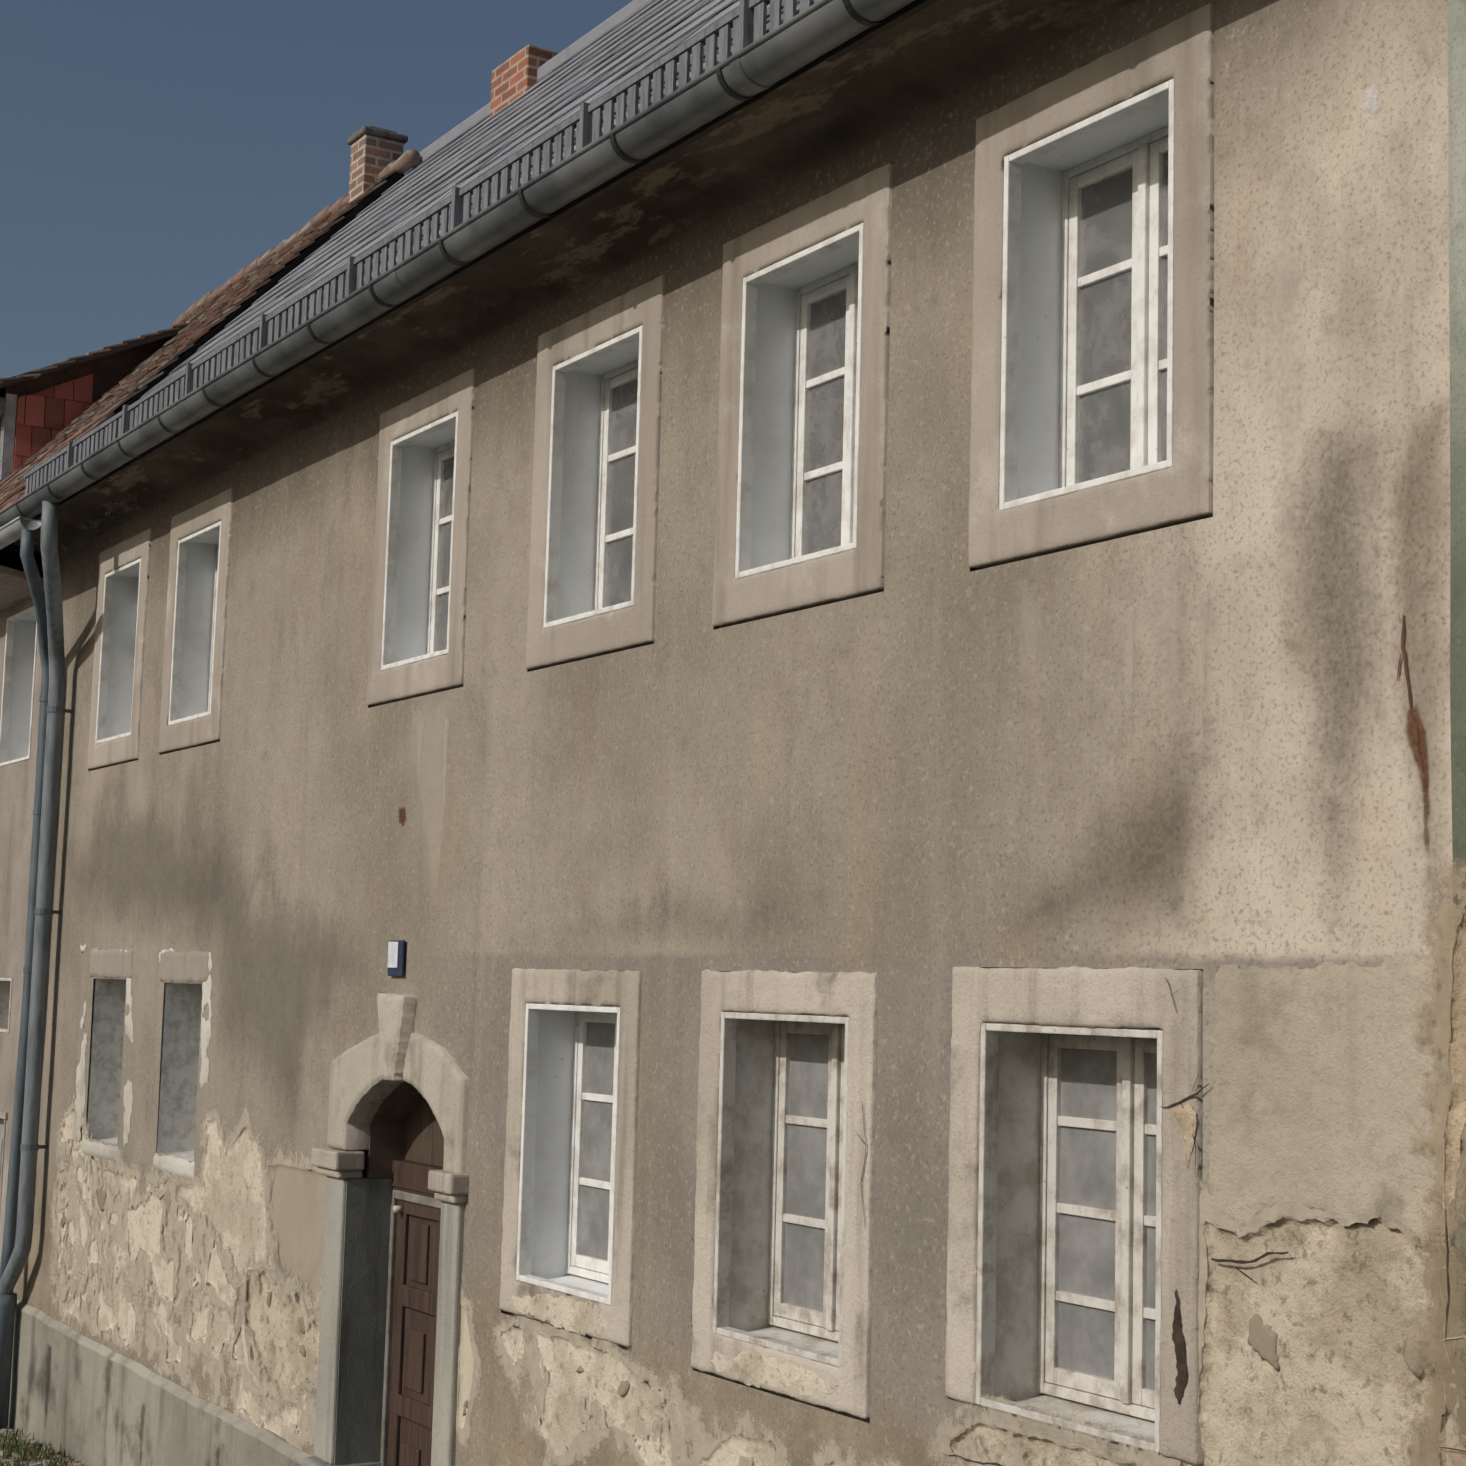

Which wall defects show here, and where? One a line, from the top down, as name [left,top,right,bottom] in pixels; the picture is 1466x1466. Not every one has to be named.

leakage [1314,461,1362,727]
rust [1407,707,1429,844]
peeling [125,978,133,1043]
peeling [200,952,212,1088]
peeling [49,1001,327,1451]
spalling [928,861,1466,1466]
peeling [456,1272,901,1466]
crack [948,1455,1002,1466]